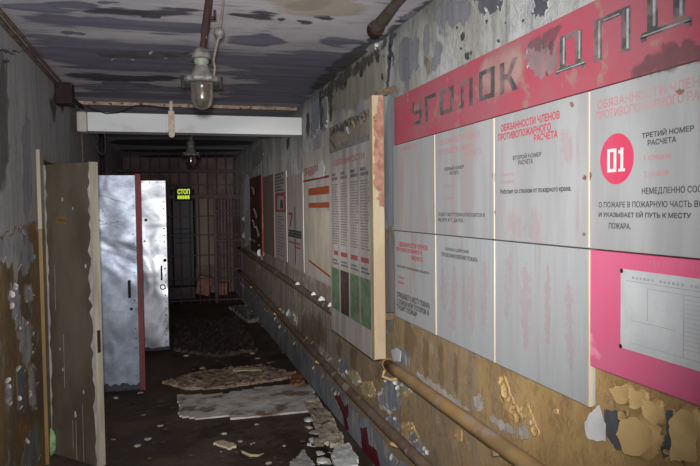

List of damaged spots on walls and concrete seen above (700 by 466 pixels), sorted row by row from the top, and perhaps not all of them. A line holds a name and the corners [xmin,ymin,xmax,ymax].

peeling [0,225,56,466]
peeling [237,279,429,466]
peeling [498,375,540,437]
peeling [584,405,629,456]
peeling [660,408,676,461]